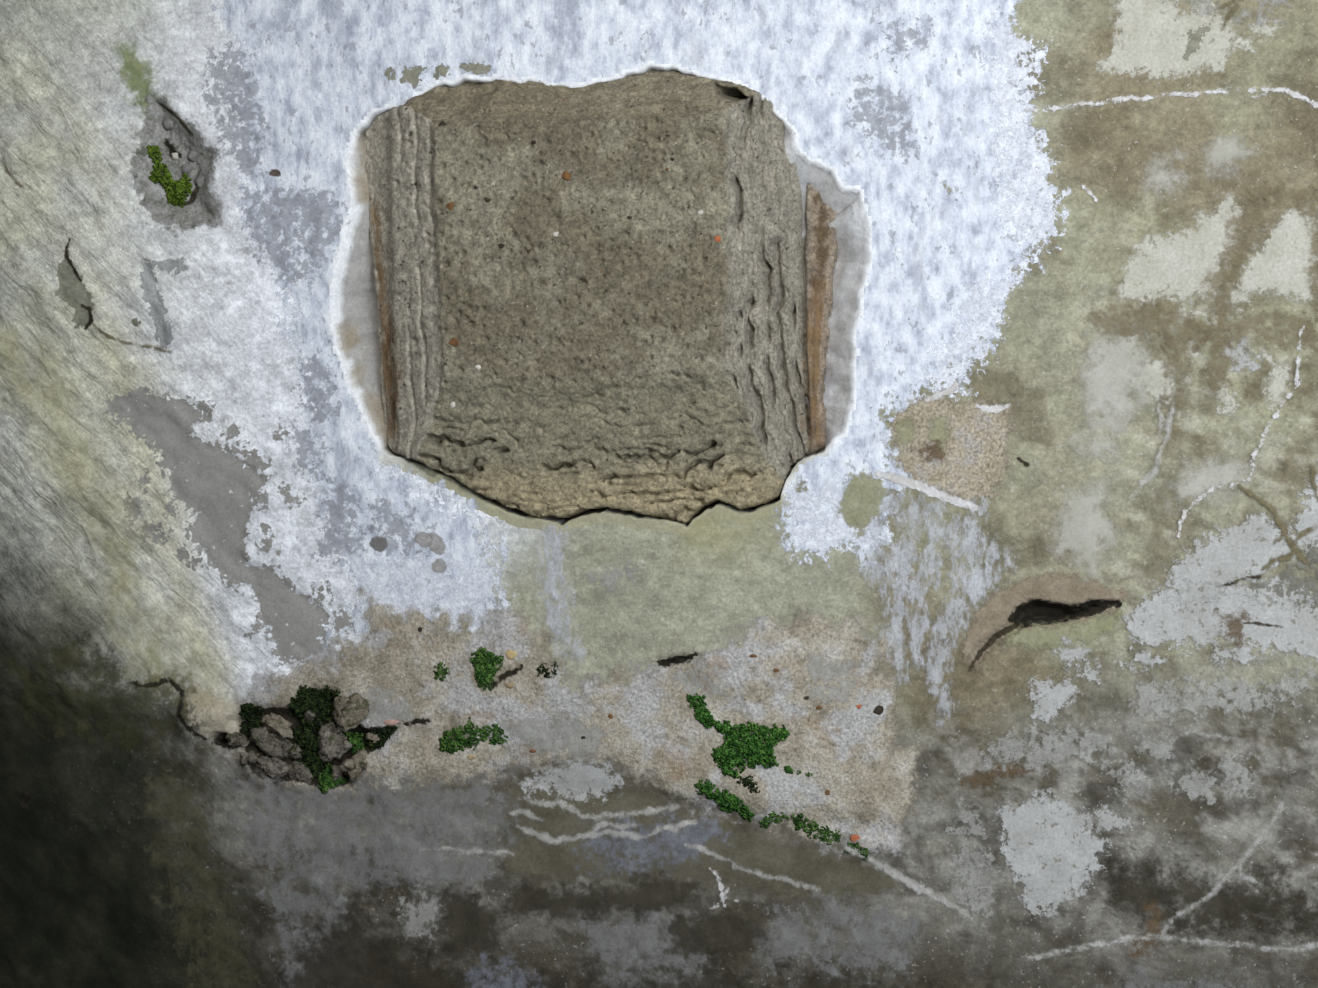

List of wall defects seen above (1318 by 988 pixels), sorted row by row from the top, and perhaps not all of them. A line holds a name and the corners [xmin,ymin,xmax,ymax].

crack [1025,87,1318,112]
damp [211,0,1071,724]
peeling [101,42,921,855]
crack [130,678,207,740]
damp [230,765,920,988]
crack [442,798,817,909]
crack [845,846,970,918]
damp [1105,859,1318,942]